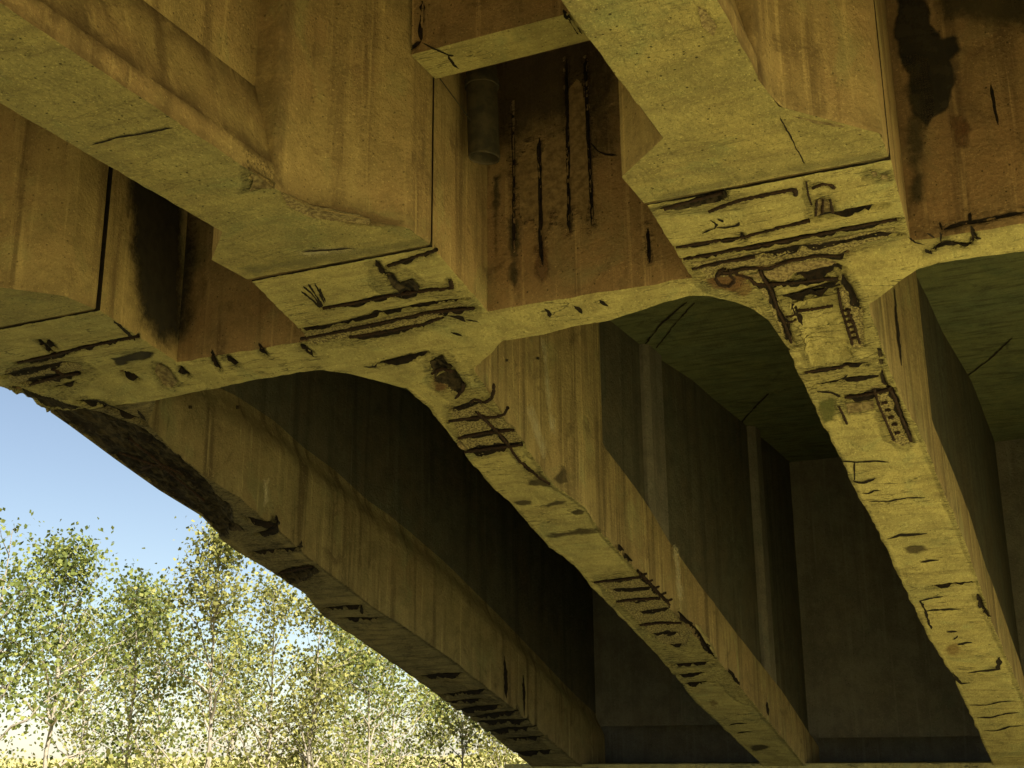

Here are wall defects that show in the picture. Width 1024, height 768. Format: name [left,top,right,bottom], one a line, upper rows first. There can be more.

crack [92,128,170,145]
crack [780,118,805,163]
damp [894,0,1024,202]
damp [128,178,197,344]
spalling [300,248,475,351]
spalling [659,181,897,367]
spalling [4,334,303,555]
spalling [365,351,550,485]
spalling [278,565,320,584]
spalling [594,544,717,687]
spalling [445,656,551,757]